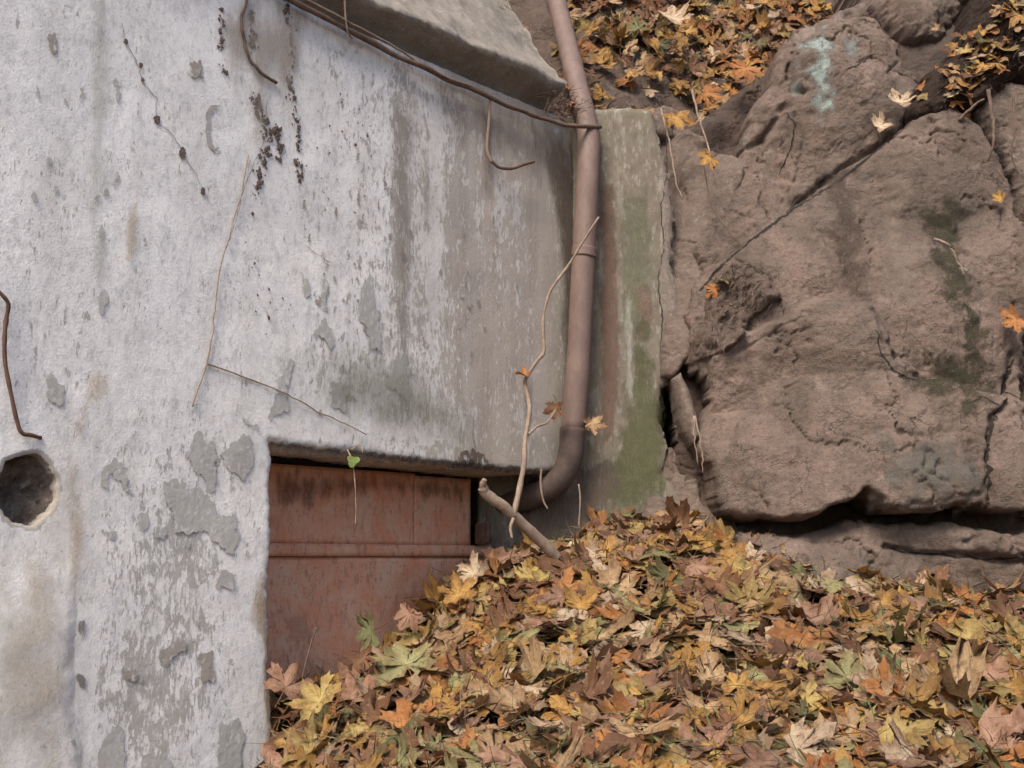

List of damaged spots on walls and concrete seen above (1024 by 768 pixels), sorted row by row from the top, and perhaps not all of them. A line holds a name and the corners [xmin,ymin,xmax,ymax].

peeling [354,176,392,223]
leakage [547,136,574,353]
peeling [303,272,336,350]
peeling [347,250,392,352]
leakage [622,195,649,395]
peeling [319,364,349,416]
peeling [101,458,133,495]
peeling [136,358,295,556]
peeling [215,570,236,590]
peeling [159,631,187,666]
peeling [198,642,222,683]